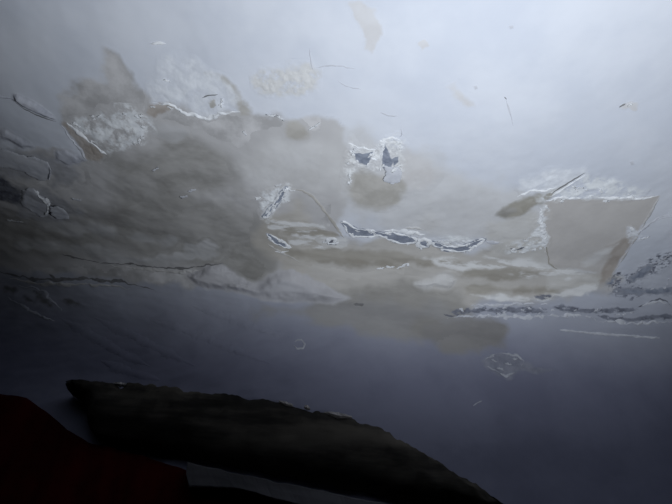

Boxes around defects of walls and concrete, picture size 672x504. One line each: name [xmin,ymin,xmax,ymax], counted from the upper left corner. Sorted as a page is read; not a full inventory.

leakage [52,41,146,134]
peeling [0,49,243,223]
peeling [339,130,410,190]
crack [0,253,221,290]
flaking render [254,181,295,224]
flaking render [265,232,300,263]
leakage [0,72,615,361]
flaking render [315,221,487,253]
peeling [499,163,656,258]
peeling [601,247,672,301]